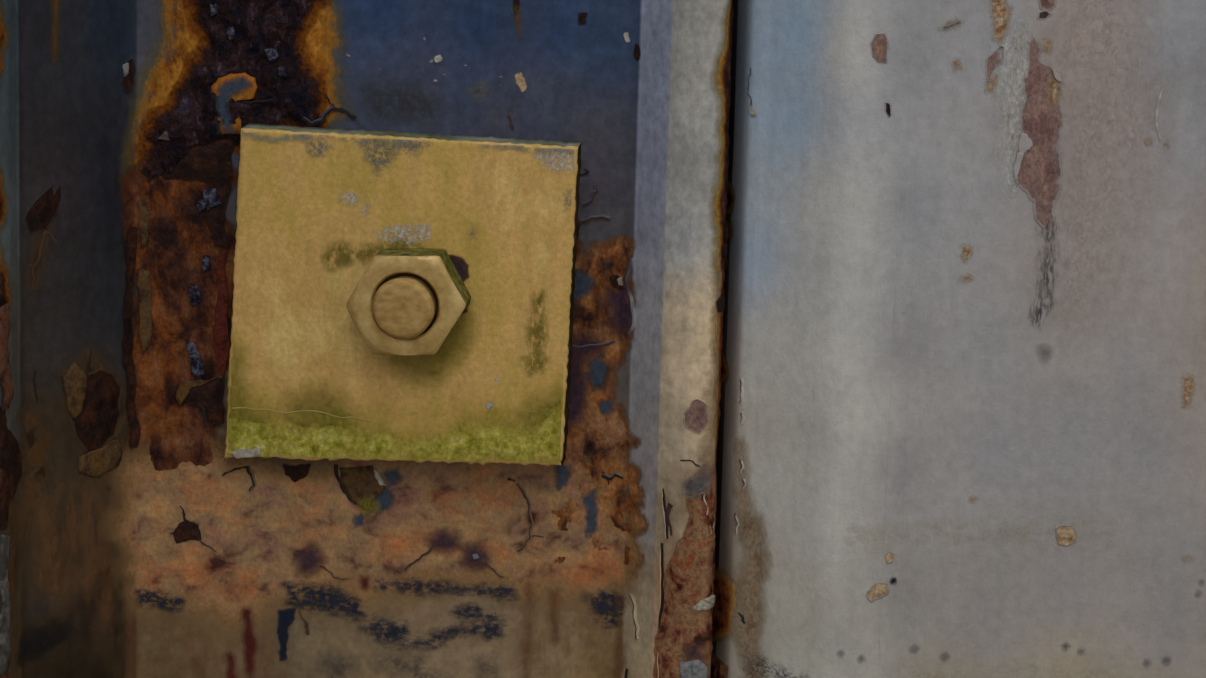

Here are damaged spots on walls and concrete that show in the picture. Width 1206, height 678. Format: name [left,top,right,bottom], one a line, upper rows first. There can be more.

peeling [1037,0,1057,21]
peeling [1013,36,1064,233]
corrosion [0,248,11,307]
corrosion [63,0,648,678]
corrosion [653,0,767,678]
corrosion [0,407,23,532]